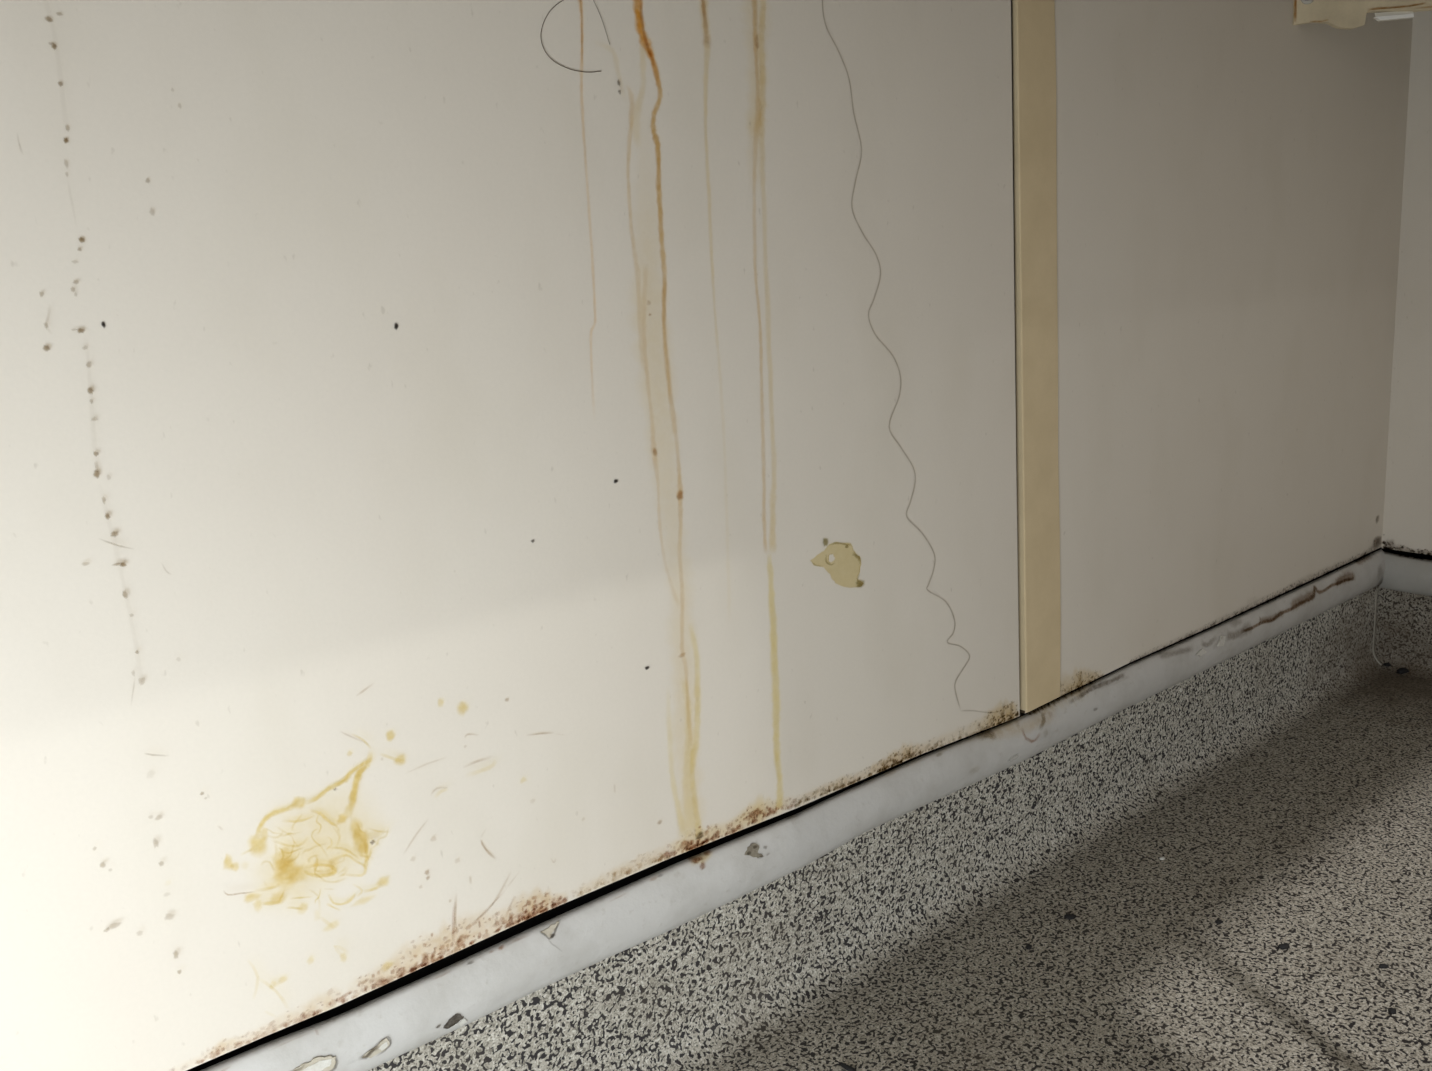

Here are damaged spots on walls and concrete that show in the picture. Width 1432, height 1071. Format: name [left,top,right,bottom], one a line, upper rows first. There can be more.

peeling [362,1038,390,1058]
peeling [293,1055,336,1071]